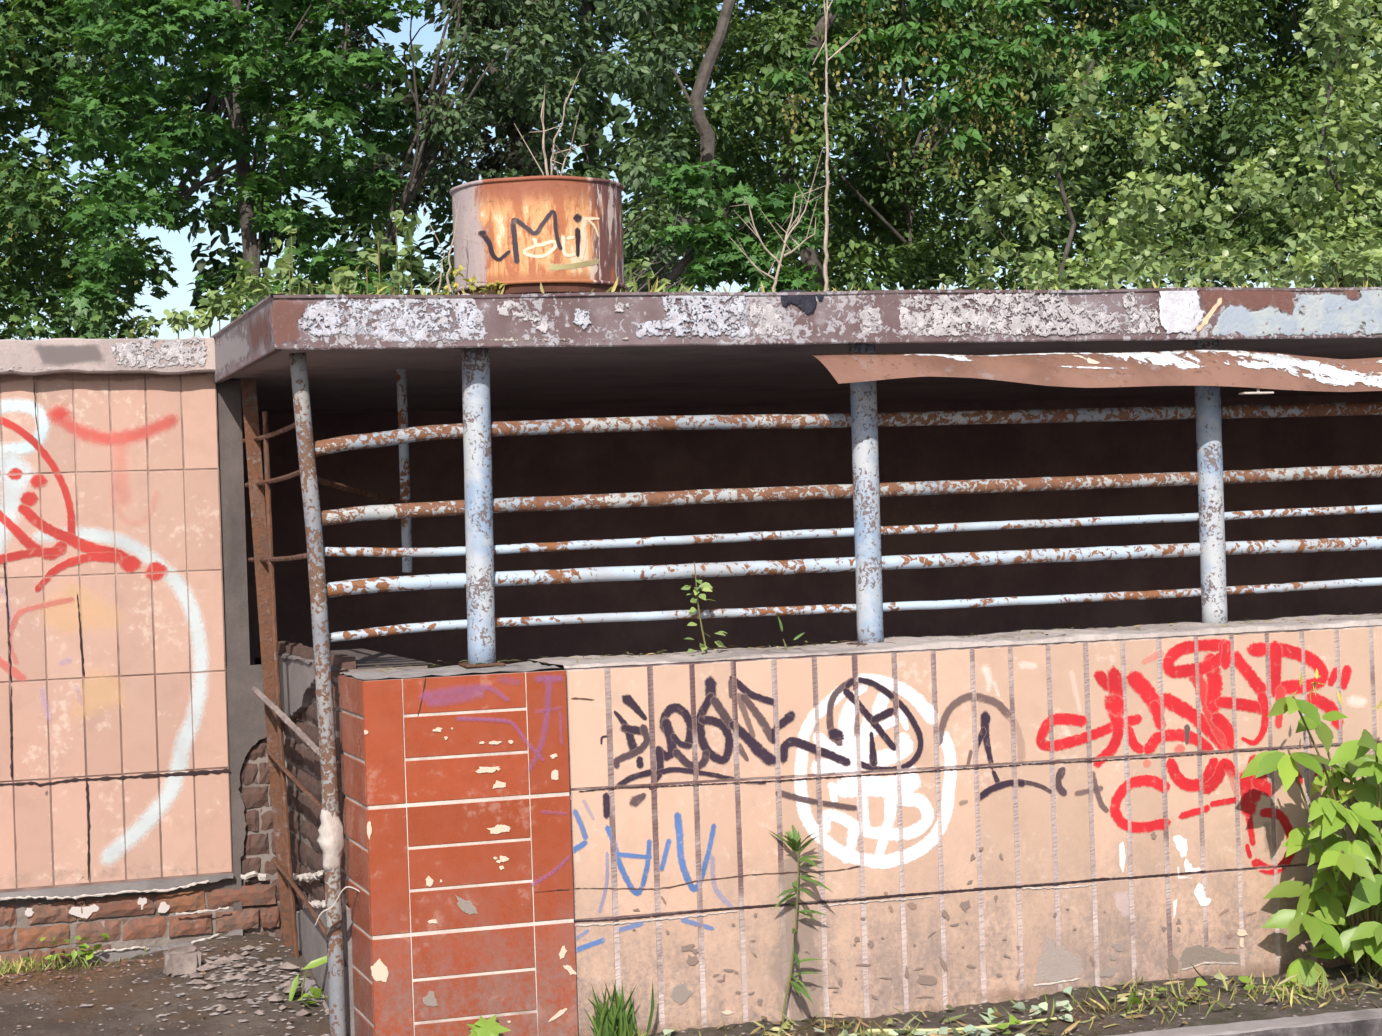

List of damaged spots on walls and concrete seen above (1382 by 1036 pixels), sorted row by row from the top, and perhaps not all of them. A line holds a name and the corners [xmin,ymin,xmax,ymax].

peeling [298,293,565,345]
peeling [573,307,605,340]
peeling [614,289,792,340]
peeling [857,285,1382,337]
crack [0,559,230,879]
peeling [475,767,506,789]
spalling [0,641,356,968]
peeling [486,825,510,834]
peeling [456,896,478,915]
peeling [371,958,389,982]
peeling [559,945,576,975]
peeling [423,991,438,1007]